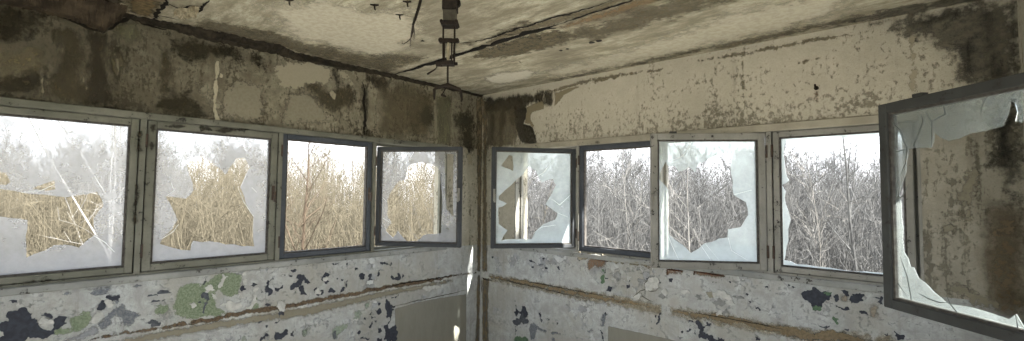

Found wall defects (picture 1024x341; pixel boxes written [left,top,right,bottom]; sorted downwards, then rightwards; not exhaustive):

damp [0,28,126,107]
crack [60,0,210,34]
damp [156,21,437,139]
crack [360,82,368,136]
crack [394,0,633,75]
damp [453,68,607,166]
damp [622,0,1018,92]
damp [985,91,1024,317]
peeling [0,262,404,341]
peeling [513,305,561,341]
peeling [577,251,761,341]
peeling [788,284,883,331]